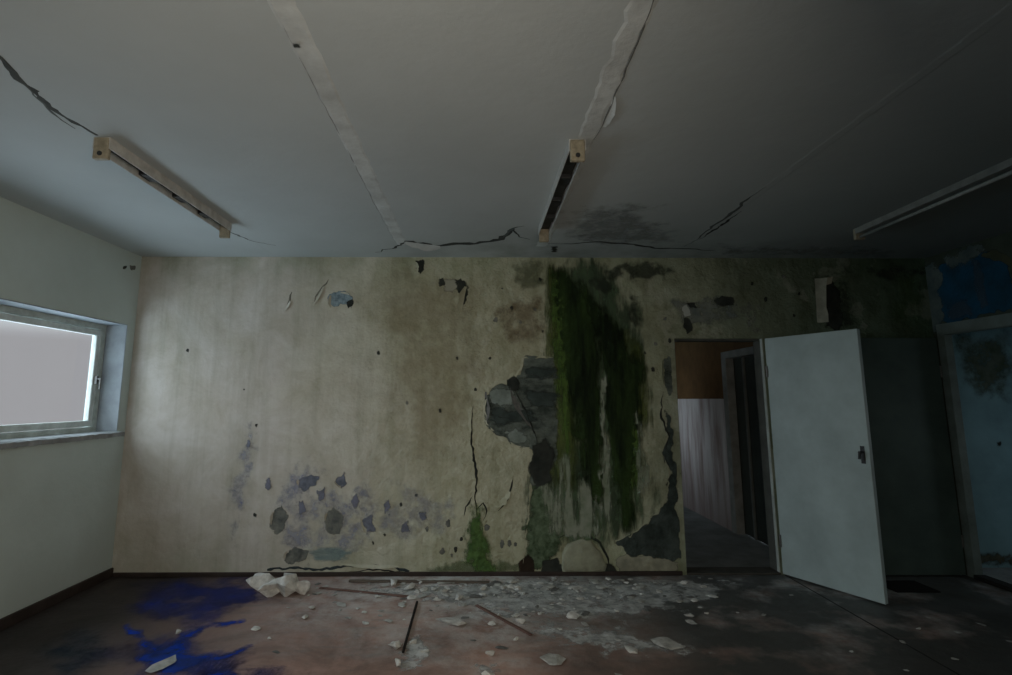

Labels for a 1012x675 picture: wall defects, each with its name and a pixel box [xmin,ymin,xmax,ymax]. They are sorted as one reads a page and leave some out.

crack [0,56,98,136]
crack [283,26,527,252]
crack [594,0,654,139]
peeling [313,279,354,308]
leakage [516,261,672,532]
leakage [956,334,1012,395]
crack [464,406,487,517]
spalling [474,355,562,572]
spalling [605,356,681,571]
peeling [270,506,288,534]
peeling [324,508,344,534]
peeling [267,547,410,572]